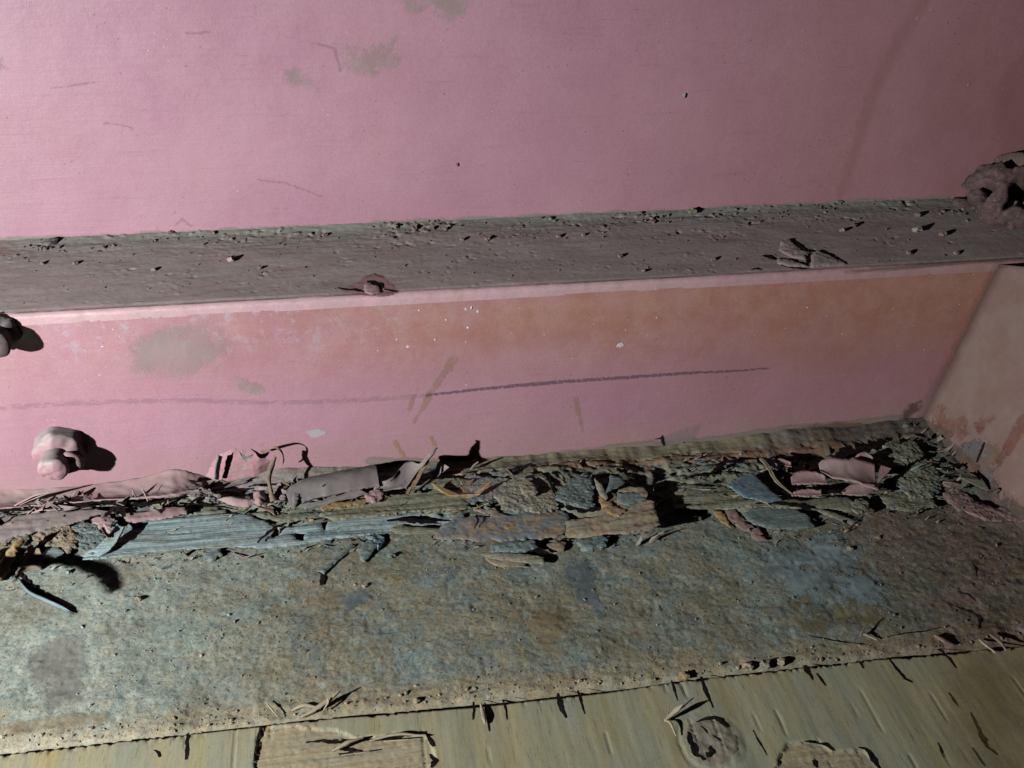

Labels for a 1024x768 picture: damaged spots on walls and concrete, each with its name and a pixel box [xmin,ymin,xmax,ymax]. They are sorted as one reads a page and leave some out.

peeling [92,507,187,529]
peeling [218,490,267,507]
peeling [285,448,438,512]
spalling [684,438,908,511]